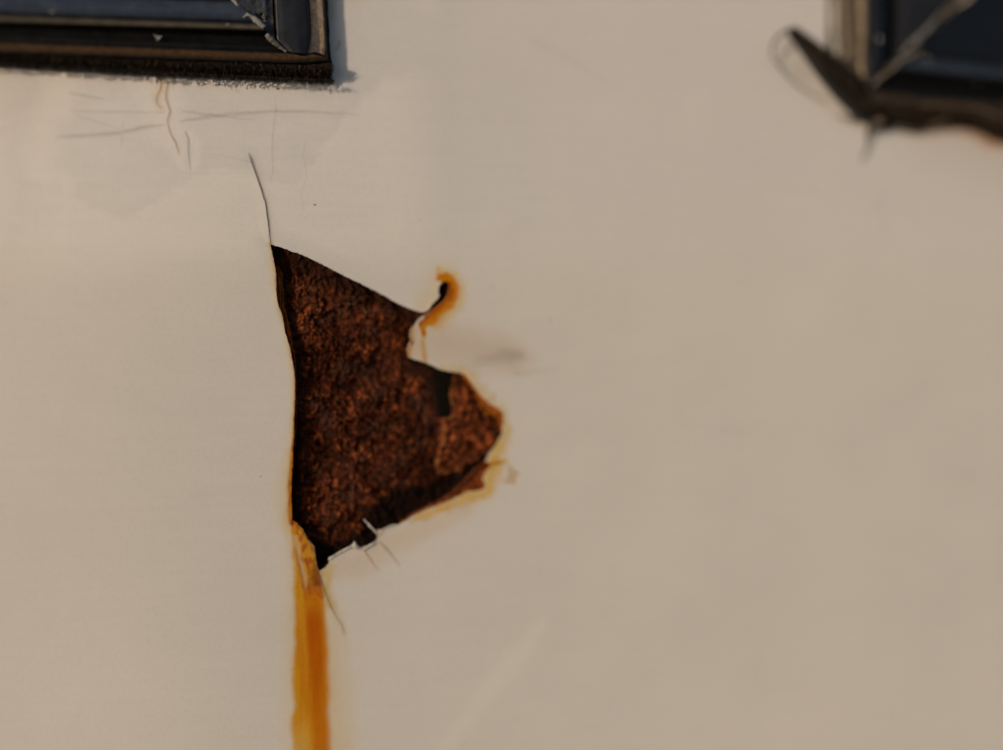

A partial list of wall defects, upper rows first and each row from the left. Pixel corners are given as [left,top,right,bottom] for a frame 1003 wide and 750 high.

peeling [271,245,504,571]